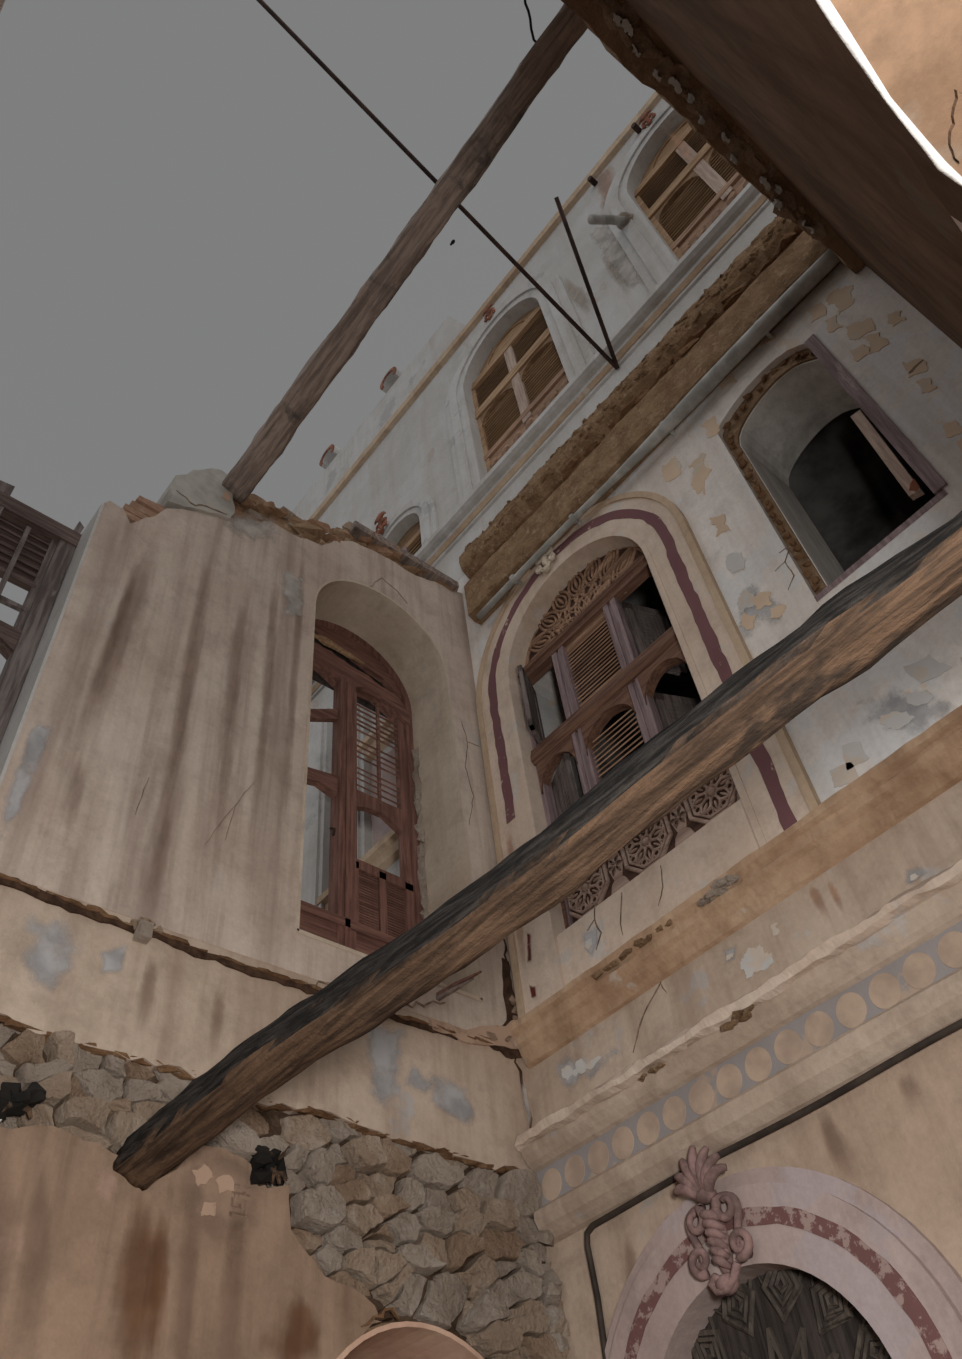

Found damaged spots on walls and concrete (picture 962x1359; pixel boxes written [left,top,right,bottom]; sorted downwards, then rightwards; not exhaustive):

peeling [807,285,906,362]
peeling [877,654,962,730]
peeling [829,741,869,788]
peeling [560,1050,614,1085]